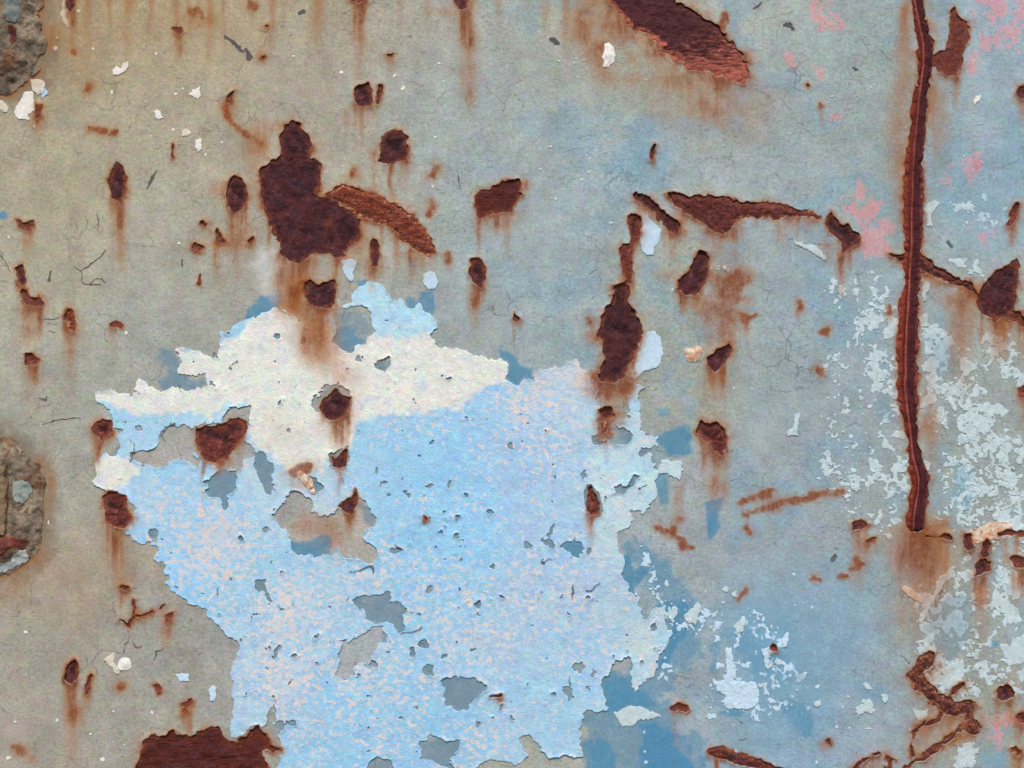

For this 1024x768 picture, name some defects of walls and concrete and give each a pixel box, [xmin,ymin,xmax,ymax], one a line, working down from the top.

corrosion [223,120,380,350]
corrosion [373,129,410,186]
corrosion [474,178,527,235]
corrosion [587,192,685,440]
peeling [921,281,930,301]
corrosion [950,258,1024,340]
corrosion [195,418,248,472]
peeling [92,184,822,768]
peeling [816,268,911,540]
peeling [902,314,1024,699]
corrosion [135,698,283,768]
corrosion [853,650,982,768]